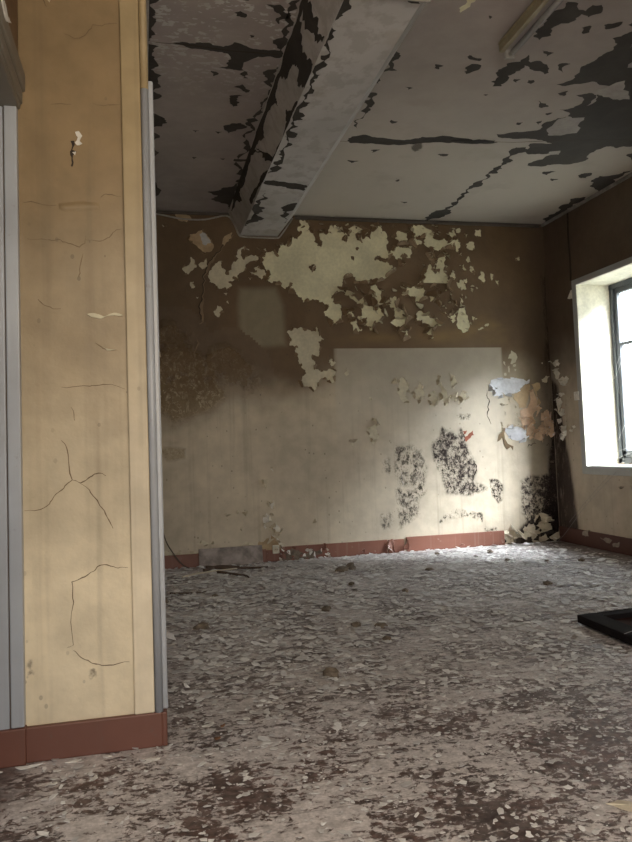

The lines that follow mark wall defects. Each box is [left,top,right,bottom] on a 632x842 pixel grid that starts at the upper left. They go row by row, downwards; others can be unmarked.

spalling [70,131,82,166]
peeling [287,326,350,392]
peeling [488,350,576,450]
crack [26,440,113,528]
mould [382,447,424,529]
mould [432,427,503,503]
damp [508,380,578,544]
crack [67,564,128,666]
peeling [15,467,632,842]